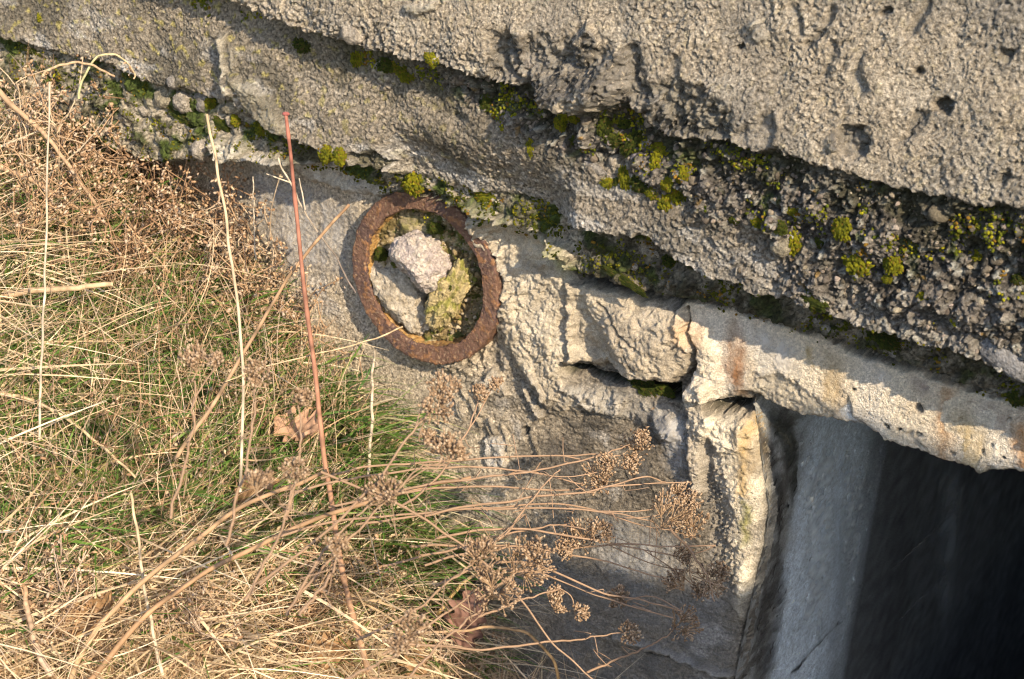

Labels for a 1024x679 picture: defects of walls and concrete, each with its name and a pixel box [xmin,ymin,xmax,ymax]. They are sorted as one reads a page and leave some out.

rust [730,345,744,392]